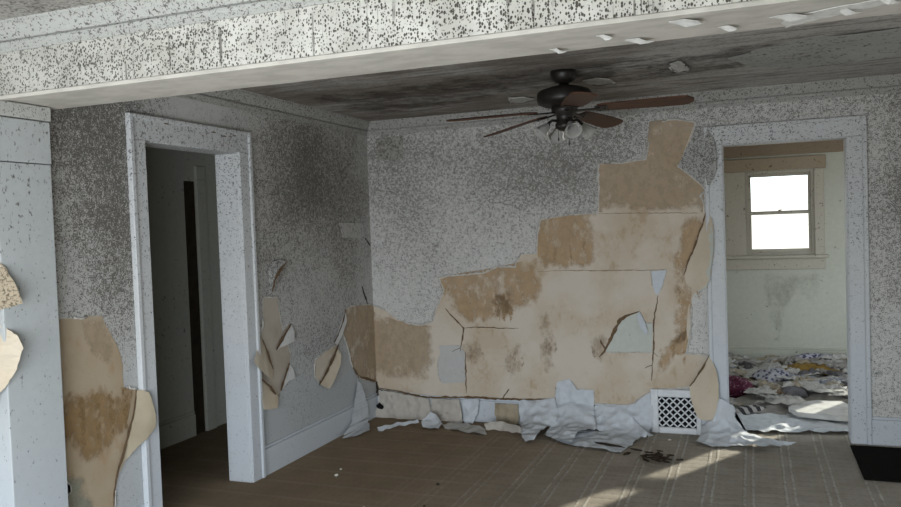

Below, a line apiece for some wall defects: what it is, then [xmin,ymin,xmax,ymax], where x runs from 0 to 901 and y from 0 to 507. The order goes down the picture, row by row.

peeling [0,263,23,310]
peeling [373,118,719,421]
peeling [0,325,23,392]
peeling [254,260,296,410]
peeling [314,309,347,389]
damp [63,388,132,460]
peeling [59,315,156,507]